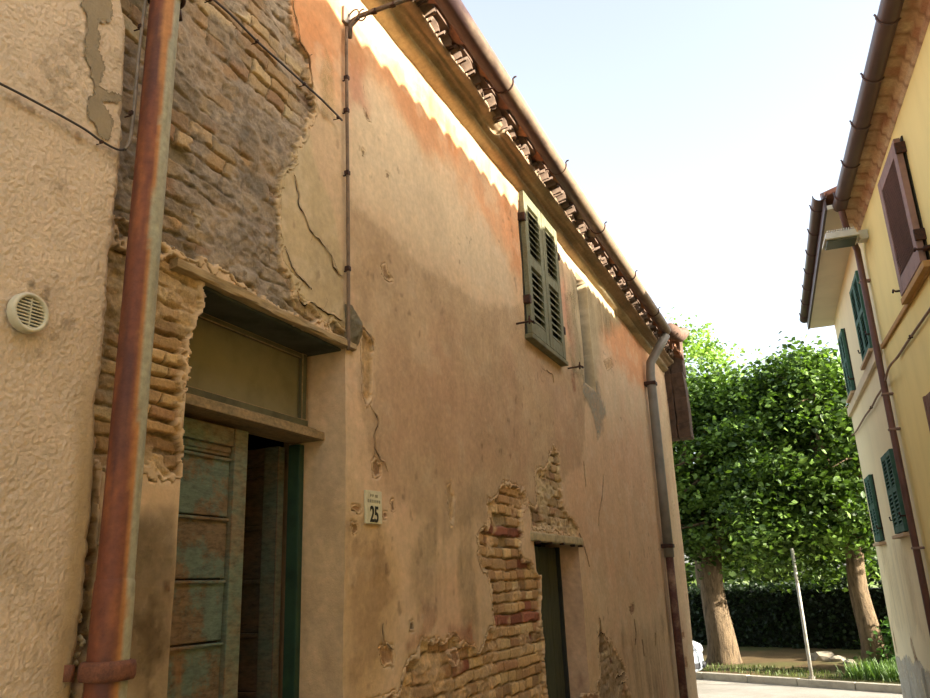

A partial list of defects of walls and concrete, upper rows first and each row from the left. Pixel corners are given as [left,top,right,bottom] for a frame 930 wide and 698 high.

flaking render [70,0,149,698]
flaking render [143,0,346,482]
crack [294,175,342,276]
crack [369,404,389,472]
flaking render [374,443,580,698]
flaking render [579,617,632,698]